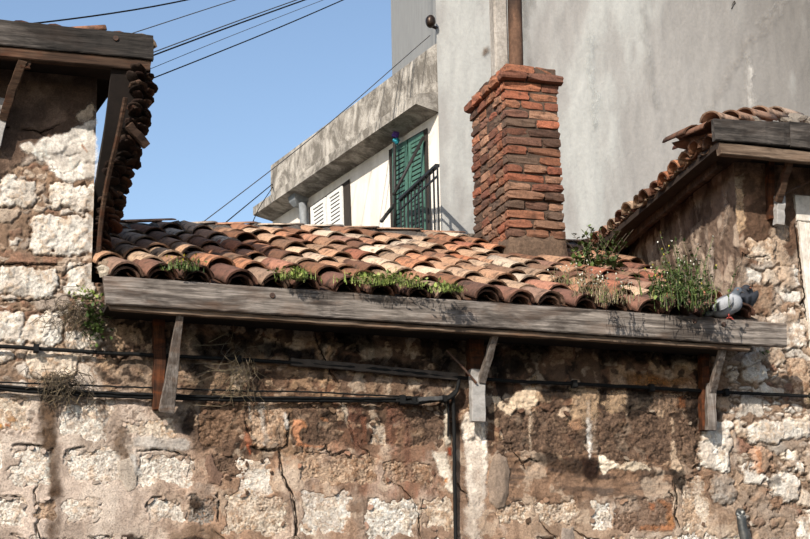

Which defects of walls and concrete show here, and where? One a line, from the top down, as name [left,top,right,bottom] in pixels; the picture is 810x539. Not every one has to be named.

flaking render [20,104,97,183]
damp [41,379,62,500]
crack [244,403,373,538]
spalling [491,375,740,539]